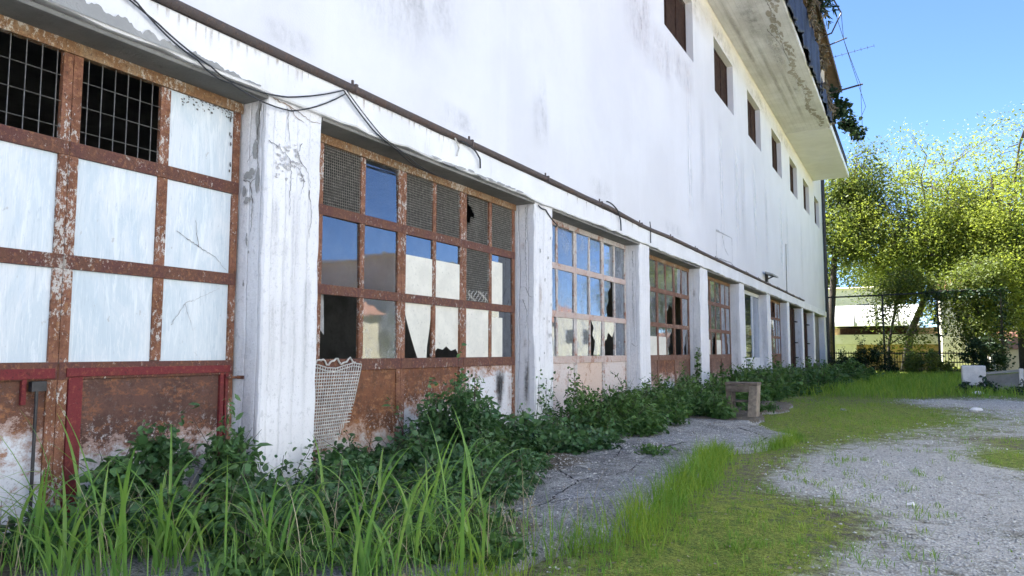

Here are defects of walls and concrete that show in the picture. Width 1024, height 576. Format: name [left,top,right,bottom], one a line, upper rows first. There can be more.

crack [243,98,321,236]